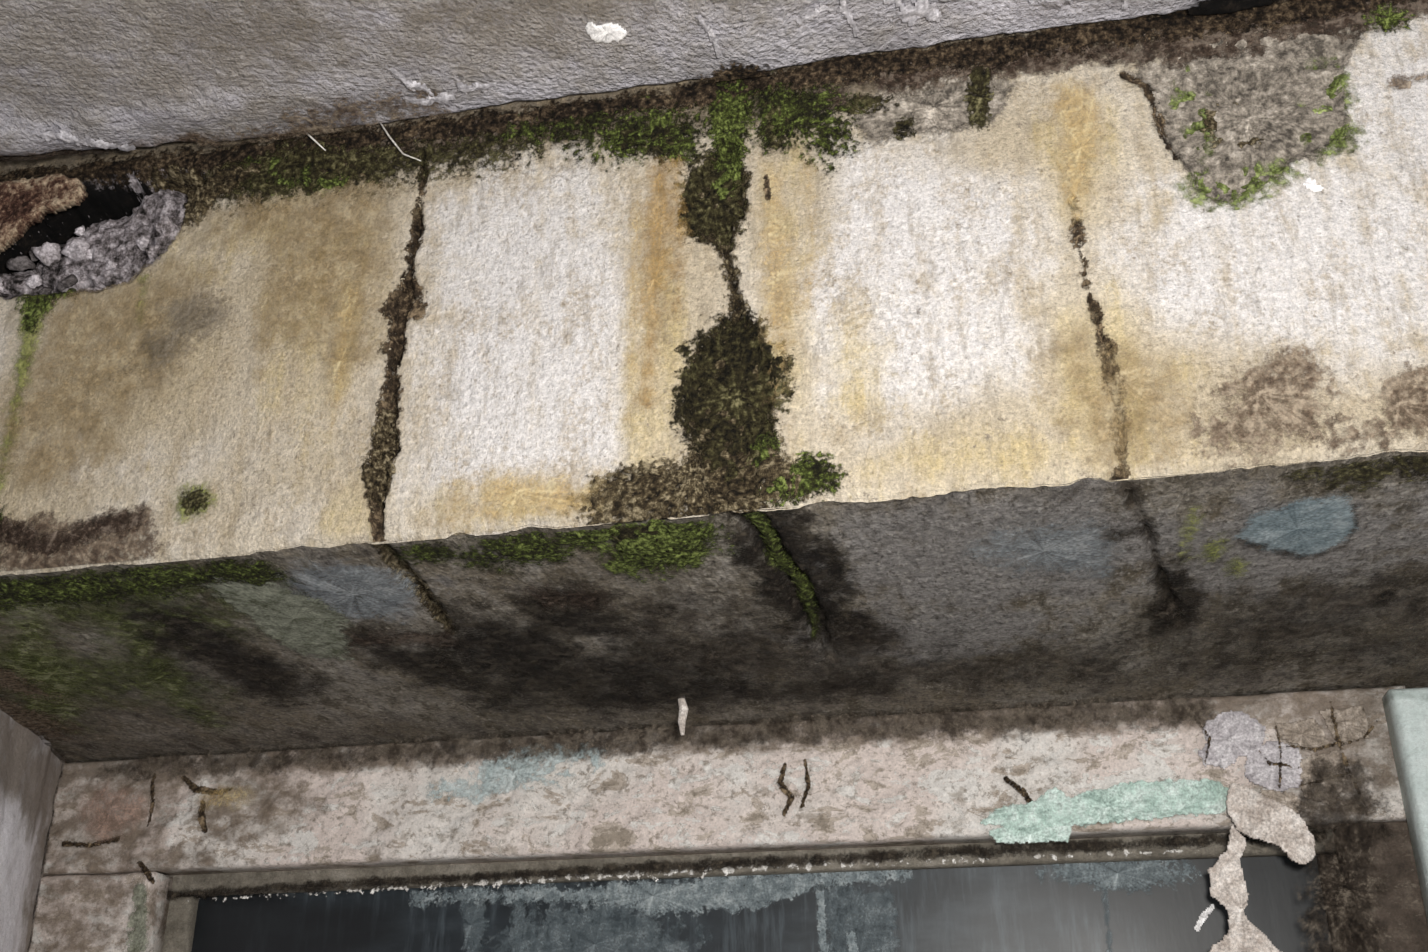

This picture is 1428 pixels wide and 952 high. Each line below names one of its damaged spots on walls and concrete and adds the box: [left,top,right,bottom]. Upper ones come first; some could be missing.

spalling [0,163,262,299]
spalling [1119,31,1366,212]
crack [361,155,459,636]
crack [565,79,911,657]
crack [1068,196,1208,637]
water stain [1191,339,1428,493]
water stain [0,503,333,733]
water stain [99,561,1428,780]
peeling [309,882,442,897]
peeling [462,860,909,889]
peeling [980,704,1370,952]